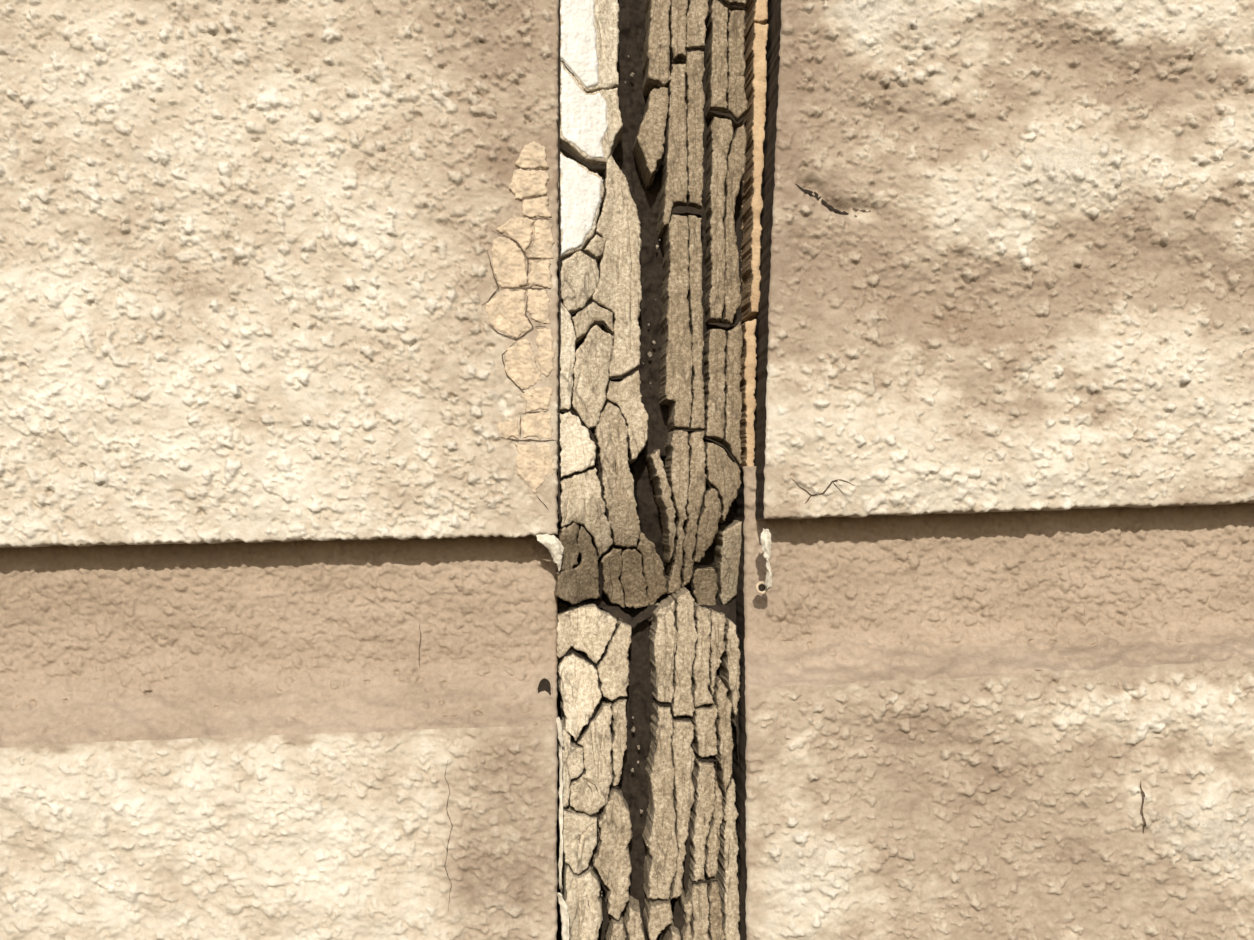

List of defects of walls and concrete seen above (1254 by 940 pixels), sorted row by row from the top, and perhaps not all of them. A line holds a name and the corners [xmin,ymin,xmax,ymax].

crack [482,0,748,940]